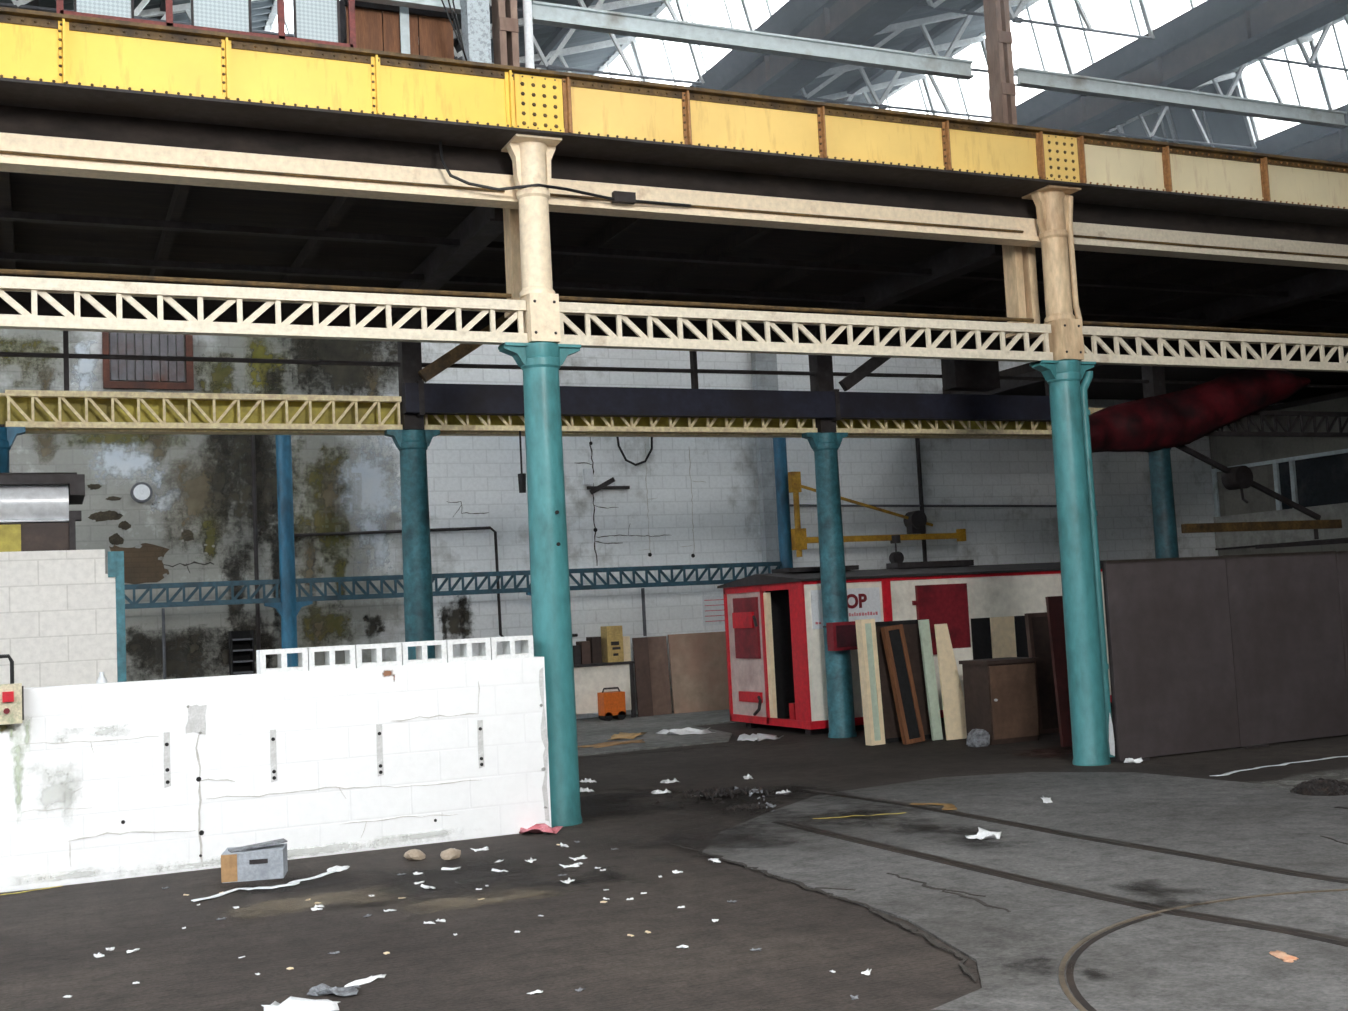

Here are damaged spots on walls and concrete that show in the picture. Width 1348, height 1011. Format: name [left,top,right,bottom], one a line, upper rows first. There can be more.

water stain [38,369,53,390]
water stain [195,353,234,393]
water stain [258,338,398,396]
spalling [87,442,215,584]
water stain [126,434,316,681]
water stain [333,558,348,595]
crack [396,681,480,722]
crack [22,735,475,865]